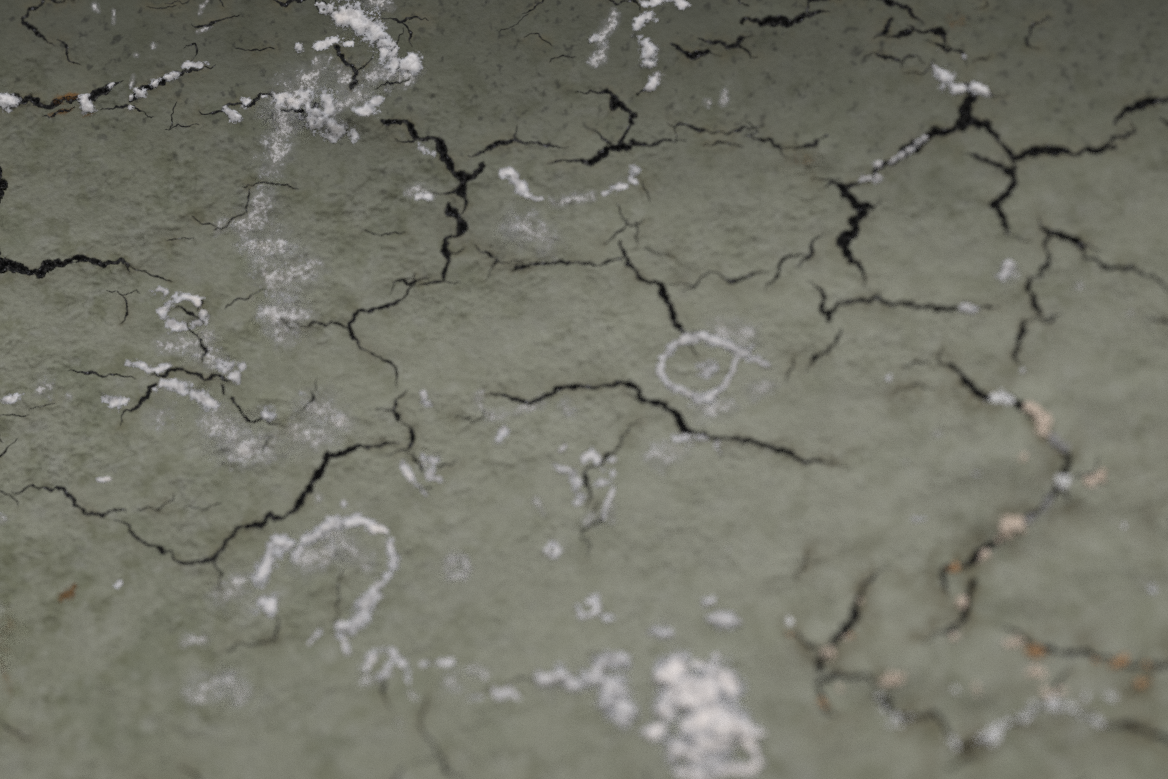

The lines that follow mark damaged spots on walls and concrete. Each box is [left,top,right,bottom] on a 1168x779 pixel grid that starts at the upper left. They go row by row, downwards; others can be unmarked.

water stain [0,93,19,113]
water stain [77,93,97,114]
water stain [128,60,210,110]
water stain [215,0,423,344]
water stain [631,0,691,92]
water stain [124,286,276,471]
crack [0,0,1168,591]
water stain [656,318,771,420]
crack [895,345,1099,643]
water stain [204,500,521,701]
water stain [533,626,766,779]
crack [781,568,1168,769]